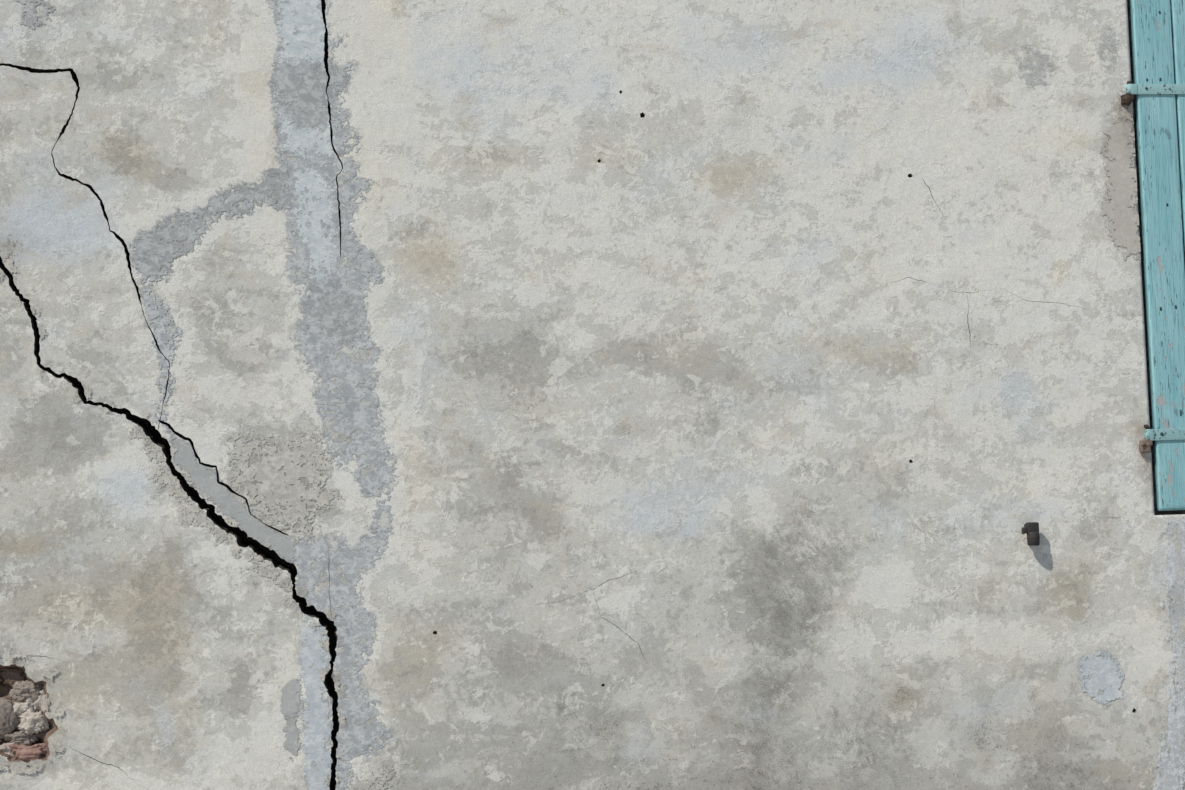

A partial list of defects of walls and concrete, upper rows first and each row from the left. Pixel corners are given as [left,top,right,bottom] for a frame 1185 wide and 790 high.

crack [321,0,343,259]
crack [0,63,346,790]
spalling [0,649,65,775]
peeling [1077,648,1125,707]